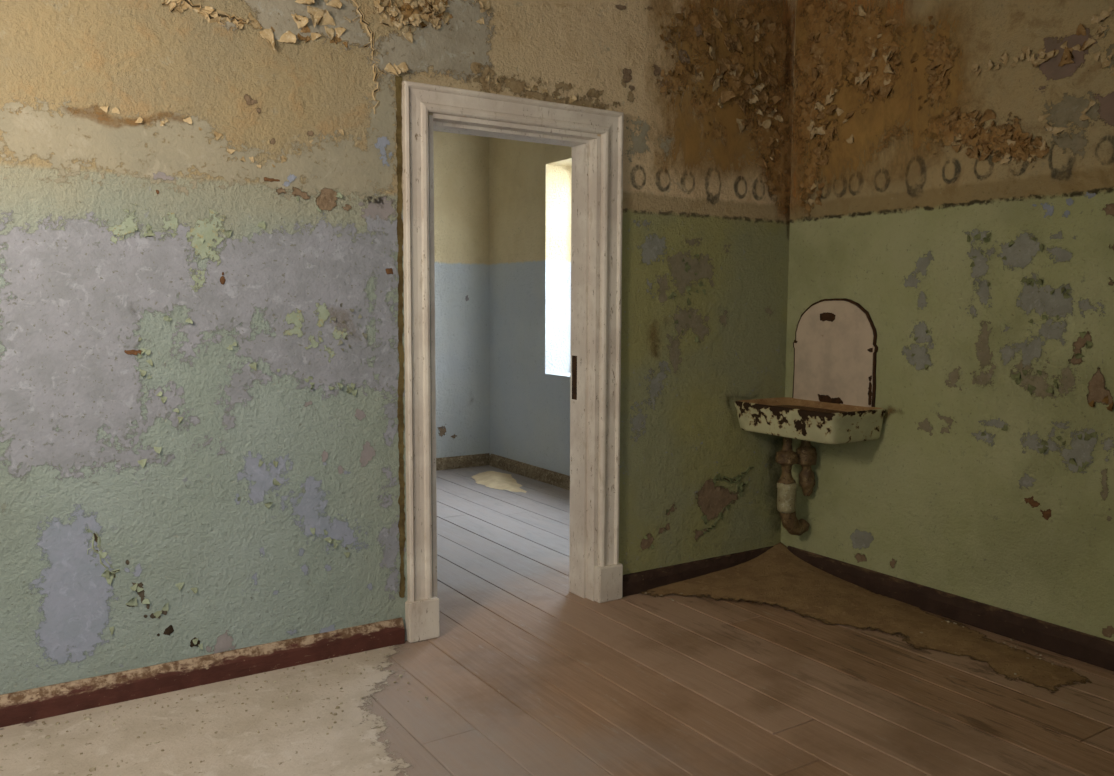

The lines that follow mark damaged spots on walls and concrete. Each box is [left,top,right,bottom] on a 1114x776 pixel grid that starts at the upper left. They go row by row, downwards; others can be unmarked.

leakage [654,0,967,216]
peeling [0,0,677,598]
peeling [901,248,934,370]
peeling [945,192,1114,412]
spalling [693,473,744,542]
peeling [1018,421,1114,521]